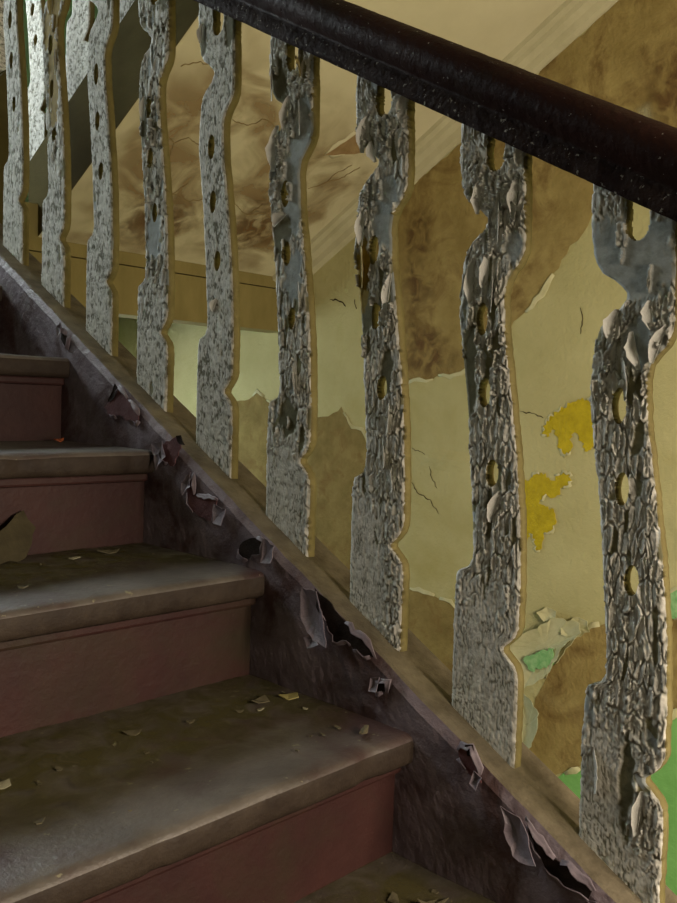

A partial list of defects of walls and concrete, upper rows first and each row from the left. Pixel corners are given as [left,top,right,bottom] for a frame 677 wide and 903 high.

peeling [537,0,677,128]
peeling [378,139,594,384]
peeling [603,309,619,343]
peeling [620,300,668,401]
spalling [237,389,271,487]
spalling [307,407,367,570]
peeling [487,491,501,523]
peeling [300,588,377,661]
spalling [408,587,455,673]
peeling [510,607,607,794]
peeling [500,806,597,903]
peeling [631,791,643,838]